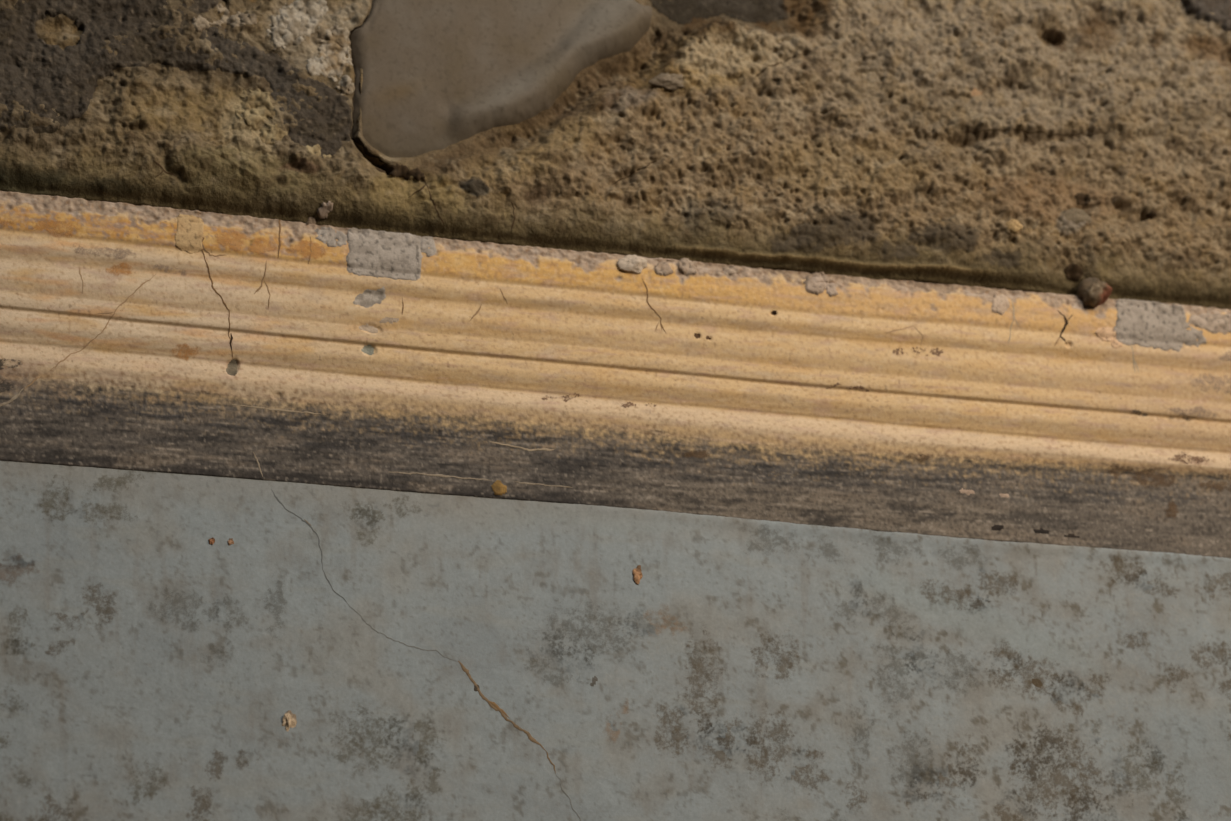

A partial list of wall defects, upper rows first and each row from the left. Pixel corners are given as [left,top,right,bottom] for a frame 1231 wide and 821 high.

crack [0,267,156,406]
crack [201,233,233,359]
crack [254,220,281,309]
peeling [420,236,437,257]
peeling [1167,323,1207,347]
crack [271,489,581,821]